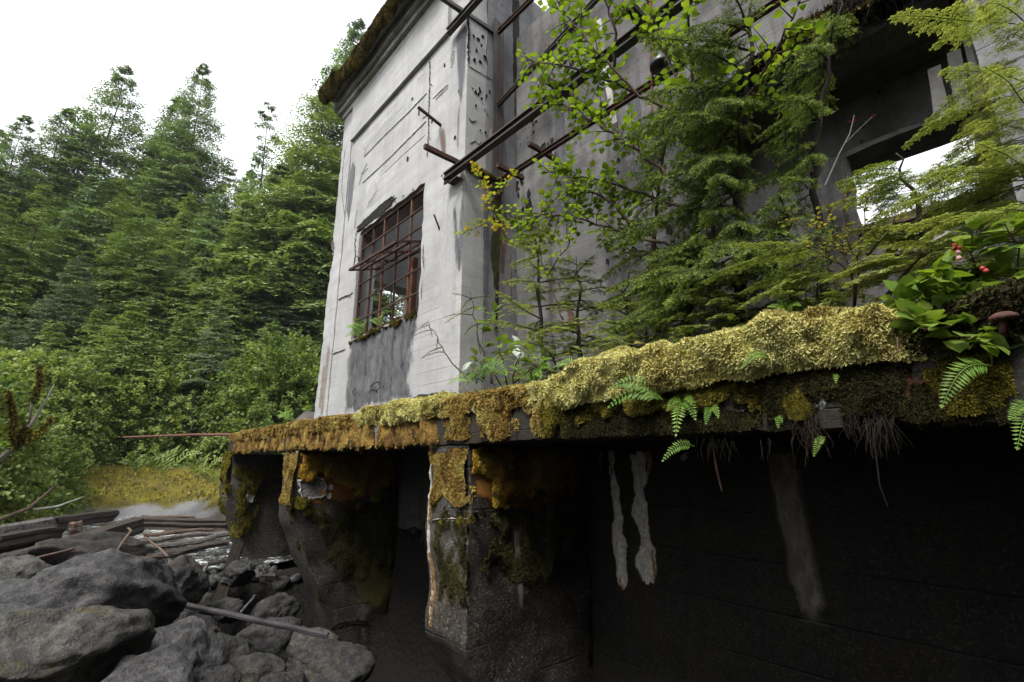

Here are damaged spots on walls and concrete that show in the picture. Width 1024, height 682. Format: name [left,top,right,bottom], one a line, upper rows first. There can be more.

leakage [346,317,416,411]
spalling [297,476,333,510]
leakage [599,450,656,590]